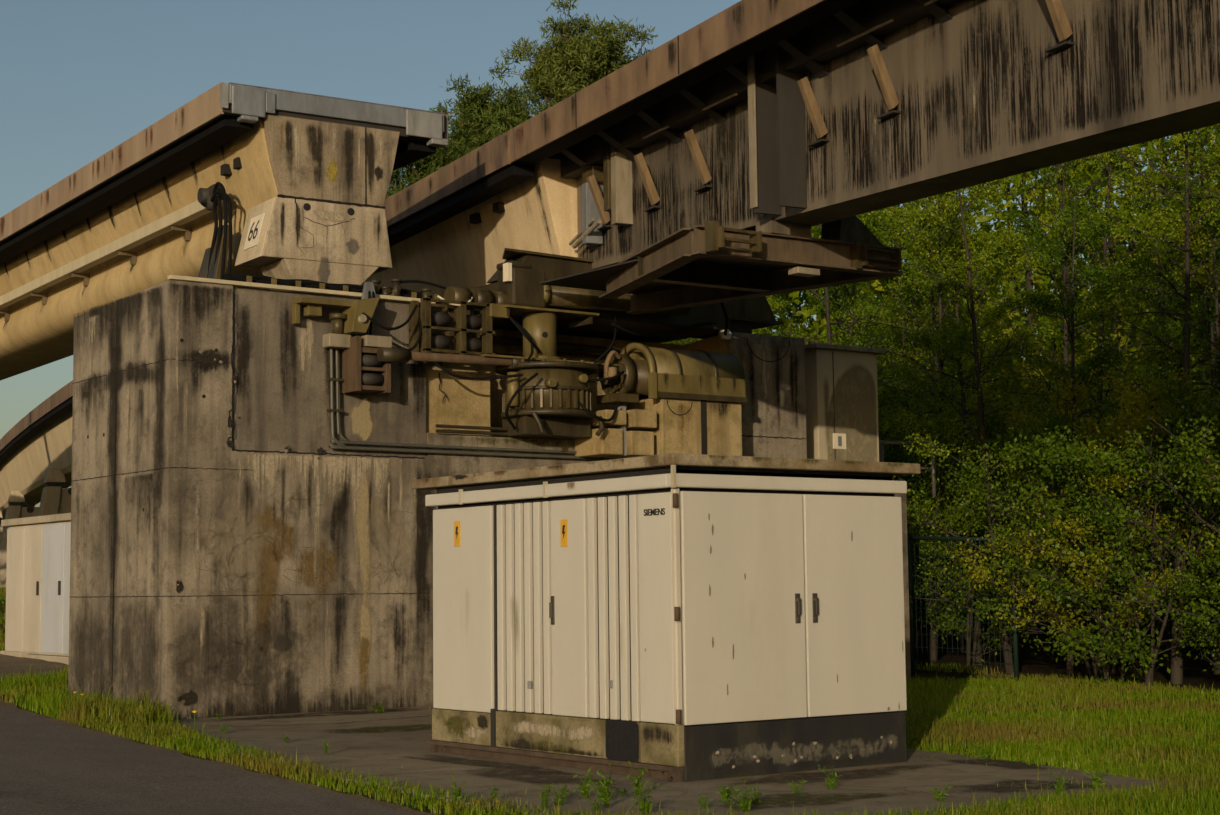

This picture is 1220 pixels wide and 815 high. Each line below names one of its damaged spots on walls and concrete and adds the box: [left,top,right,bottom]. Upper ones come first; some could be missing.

water stain [285,122,383,191]
water stain [810,135,833,199]
water stain [847,92,921,187]
water stain [963,57,996,152]
water stain [1012,8,1144,142]
water stain [1161,0,1220,94]
water stain [281,204,300,242]
water stain [280,308,334,406]
water stain [400,341,426,415]
water stain [77,284,250,599]
water stain [208,454,434,718]